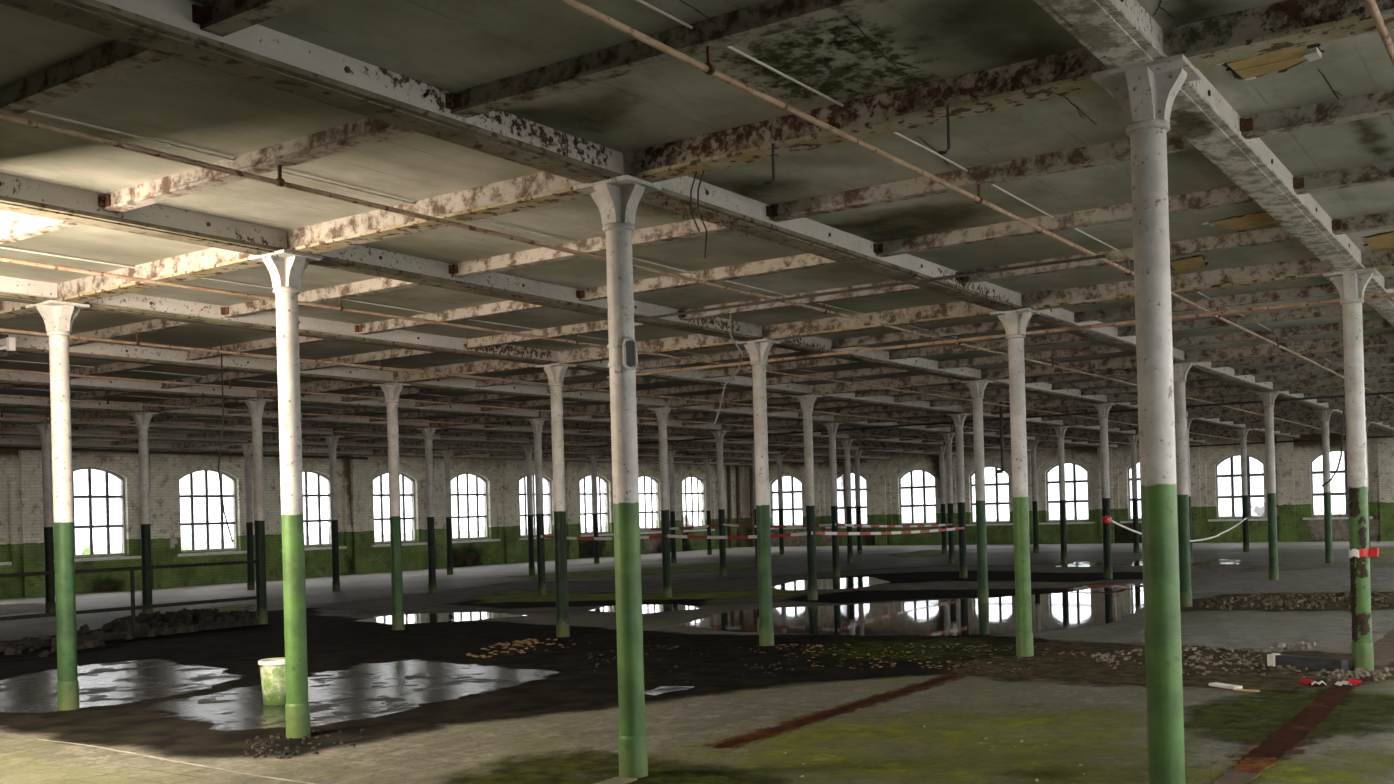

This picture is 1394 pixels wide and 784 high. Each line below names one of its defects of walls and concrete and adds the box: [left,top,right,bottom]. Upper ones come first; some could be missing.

water stain [717,0,1043,101]
crack [1153,0,1175,19]
spalling [1217,43,1325,81]
rust [364,66,612,170]
spalling [1359,231,1394,252]
peeling [1305,487,1381,641]